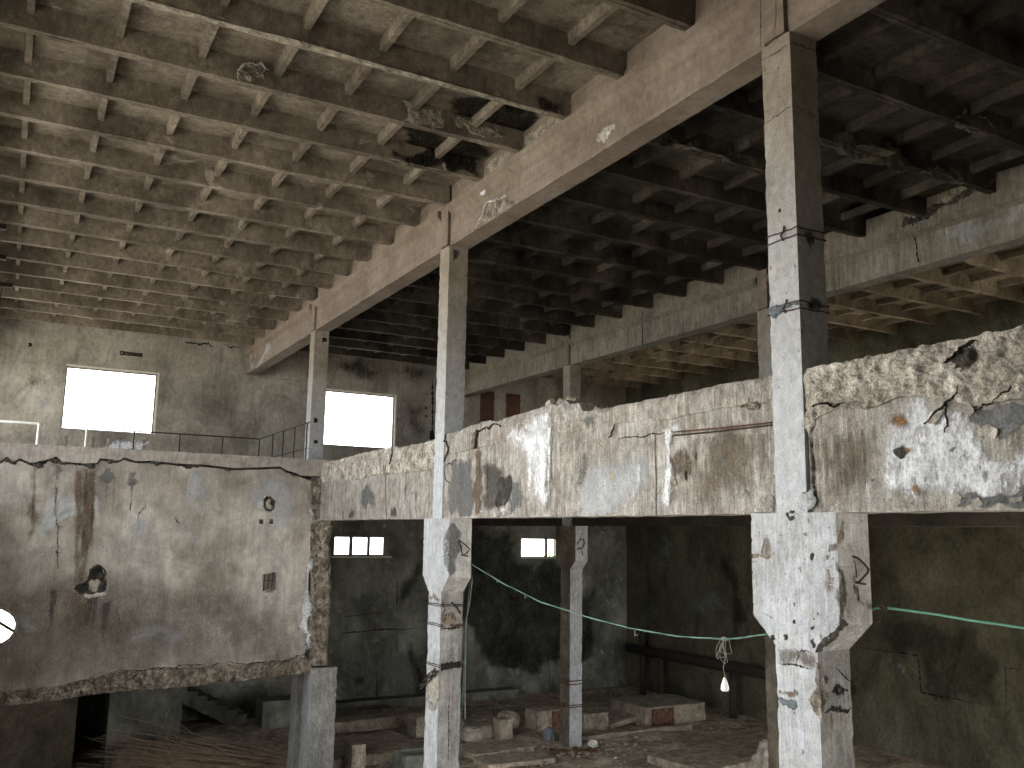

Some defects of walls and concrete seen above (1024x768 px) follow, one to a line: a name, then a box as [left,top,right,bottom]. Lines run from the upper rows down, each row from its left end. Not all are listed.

peeling [125,0,562,145]
spalling [474,194,519,228]
spalling [901,186,974,227]
spalling [802,324,1024,498]
crack [923,385,959,433]
crack [5,457,314,480]
corrosion [472,450,482,514]
peeling [952,486,1024,509]
corrosion [73,471,95,626]
spalling [0,375,773,711]
damp [443,412,561,689]
damp [582,600,593,661]